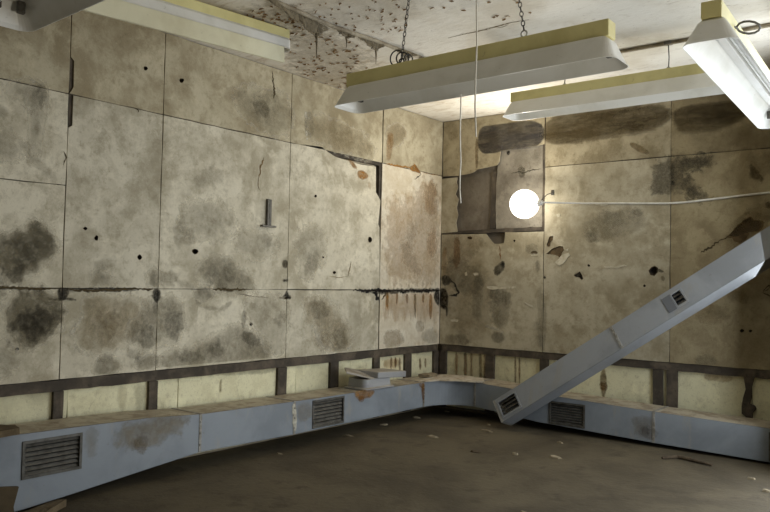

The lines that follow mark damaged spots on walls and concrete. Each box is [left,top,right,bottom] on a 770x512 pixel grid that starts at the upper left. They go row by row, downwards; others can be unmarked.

damp [0,221,55,282]
spalling [545,235,570,265]
damp [6,285,73,347]
rust [386,293,432,315]